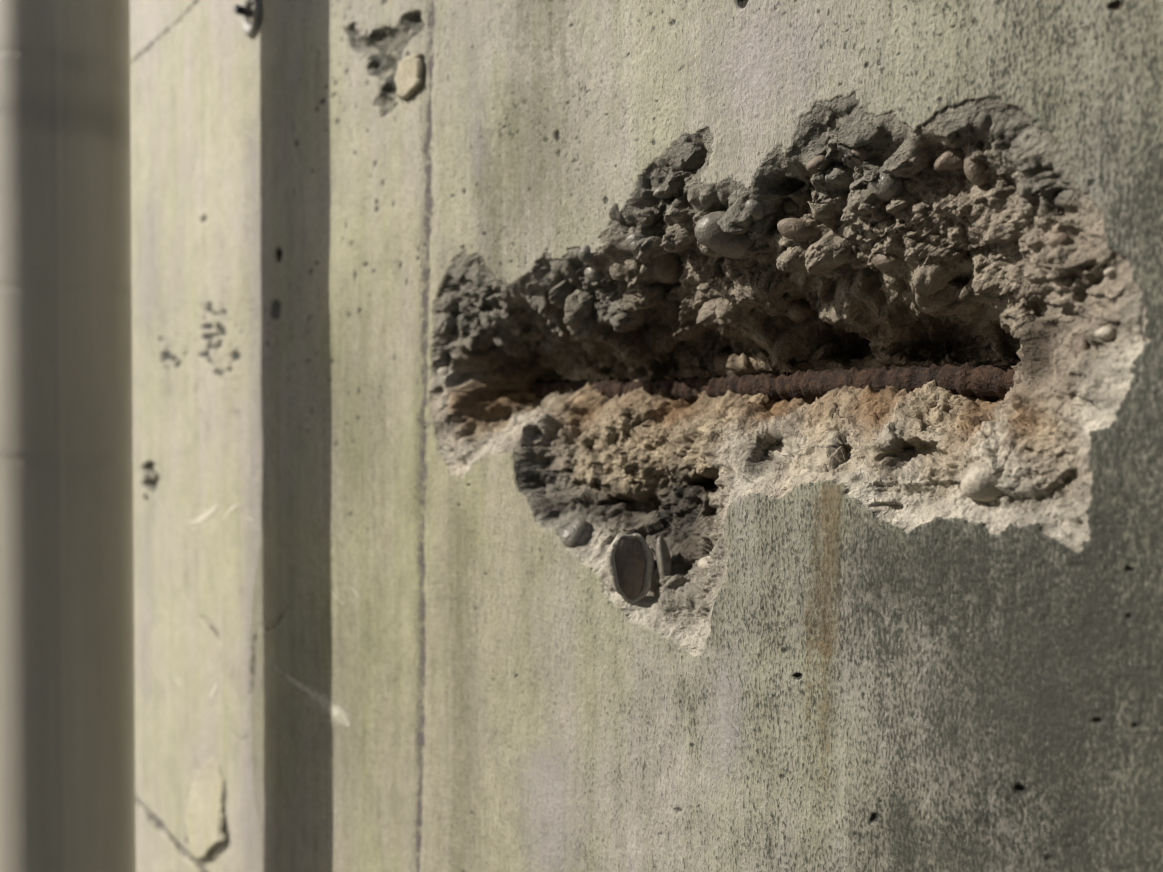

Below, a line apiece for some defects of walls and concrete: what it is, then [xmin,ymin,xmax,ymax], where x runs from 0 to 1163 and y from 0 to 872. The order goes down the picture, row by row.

spalling [341,9,424,116]
spalling [427,91,1150,657]